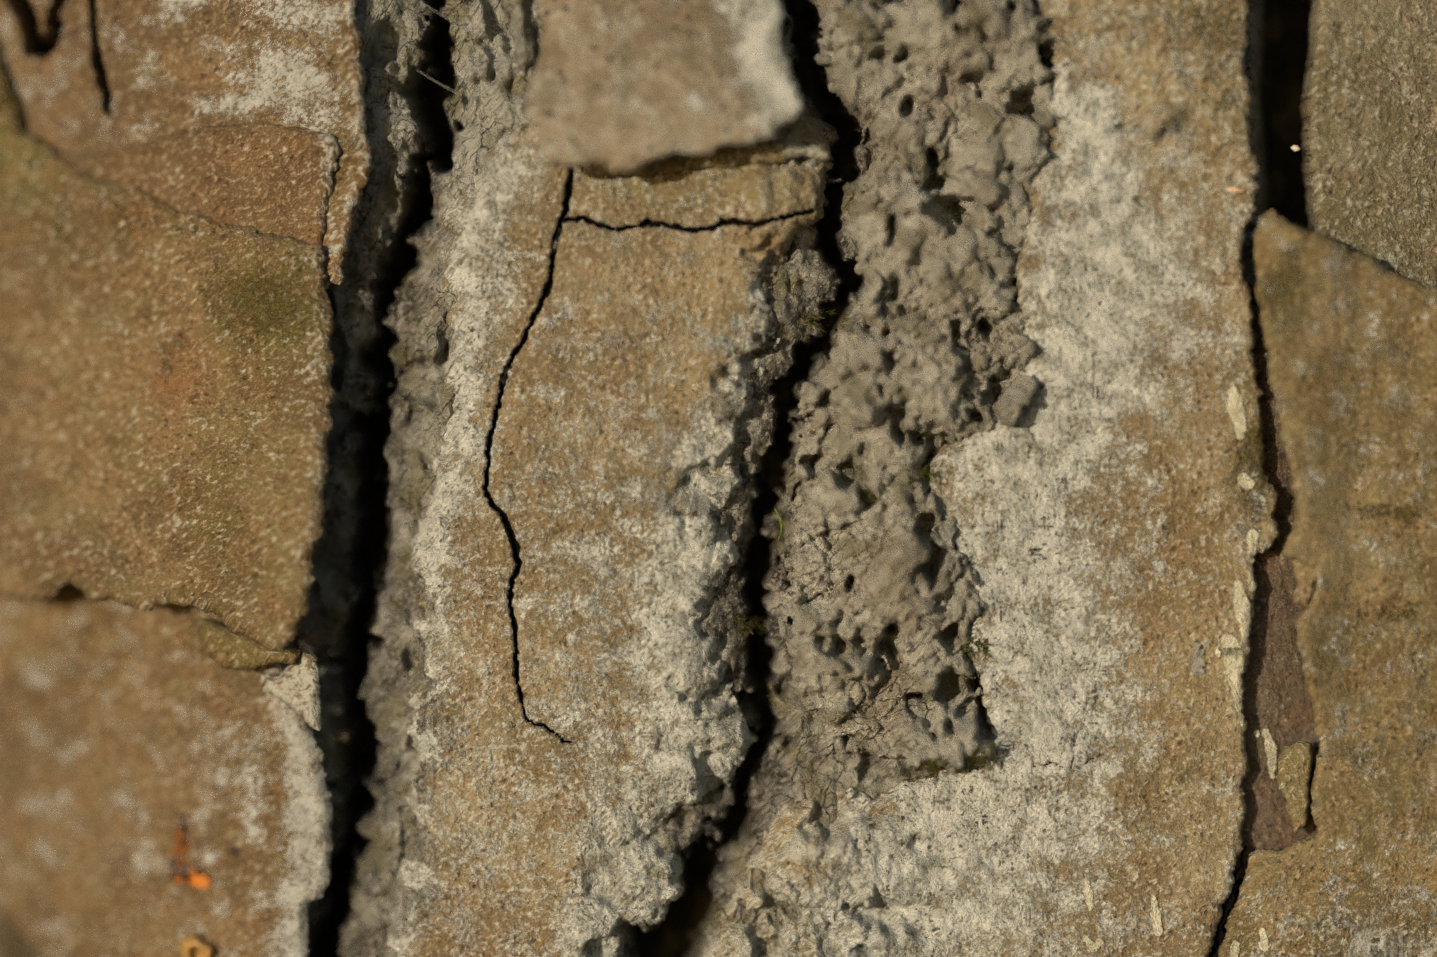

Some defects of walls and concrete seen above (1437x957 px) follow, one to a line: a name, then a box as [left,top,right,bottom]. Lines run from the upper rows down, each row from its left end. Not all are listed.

crack [19,0,64,57]
crack [1033,0,1046,83]
crack [1242,0,1272,299]
crack [283,0,544,957]
crack [483,0,941,957]
crack [958,621,994,735]
crack [1208,845,1247,957]